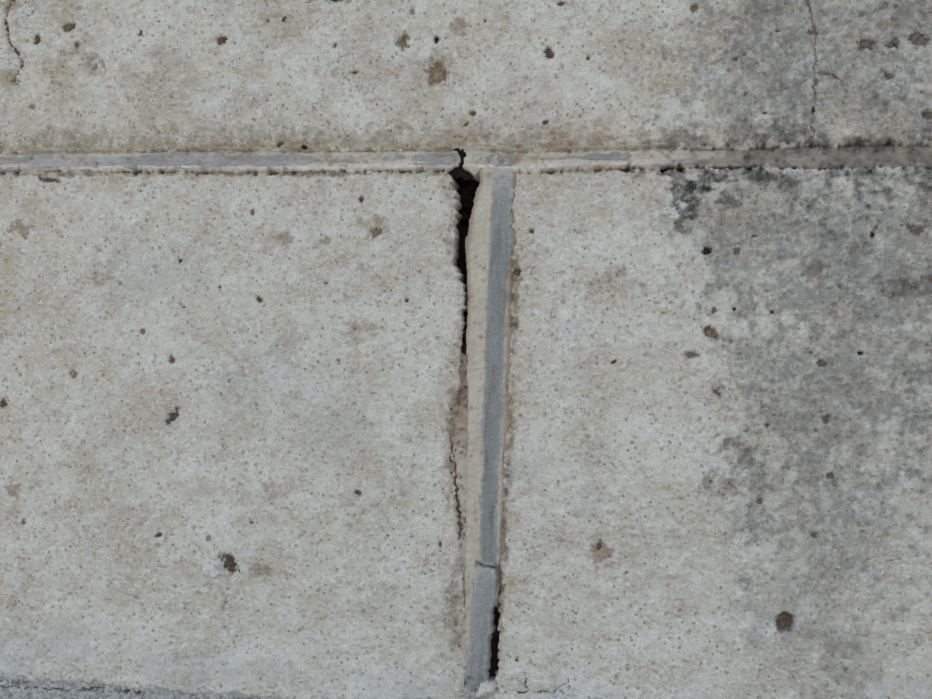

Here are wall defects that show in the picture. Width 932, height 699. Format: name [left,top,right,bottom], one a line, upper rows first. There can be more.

spalling [0,43,22,72]
spalling [13,5,45,44]
crack [448,148,480,372]
crack [449,435,463,540]